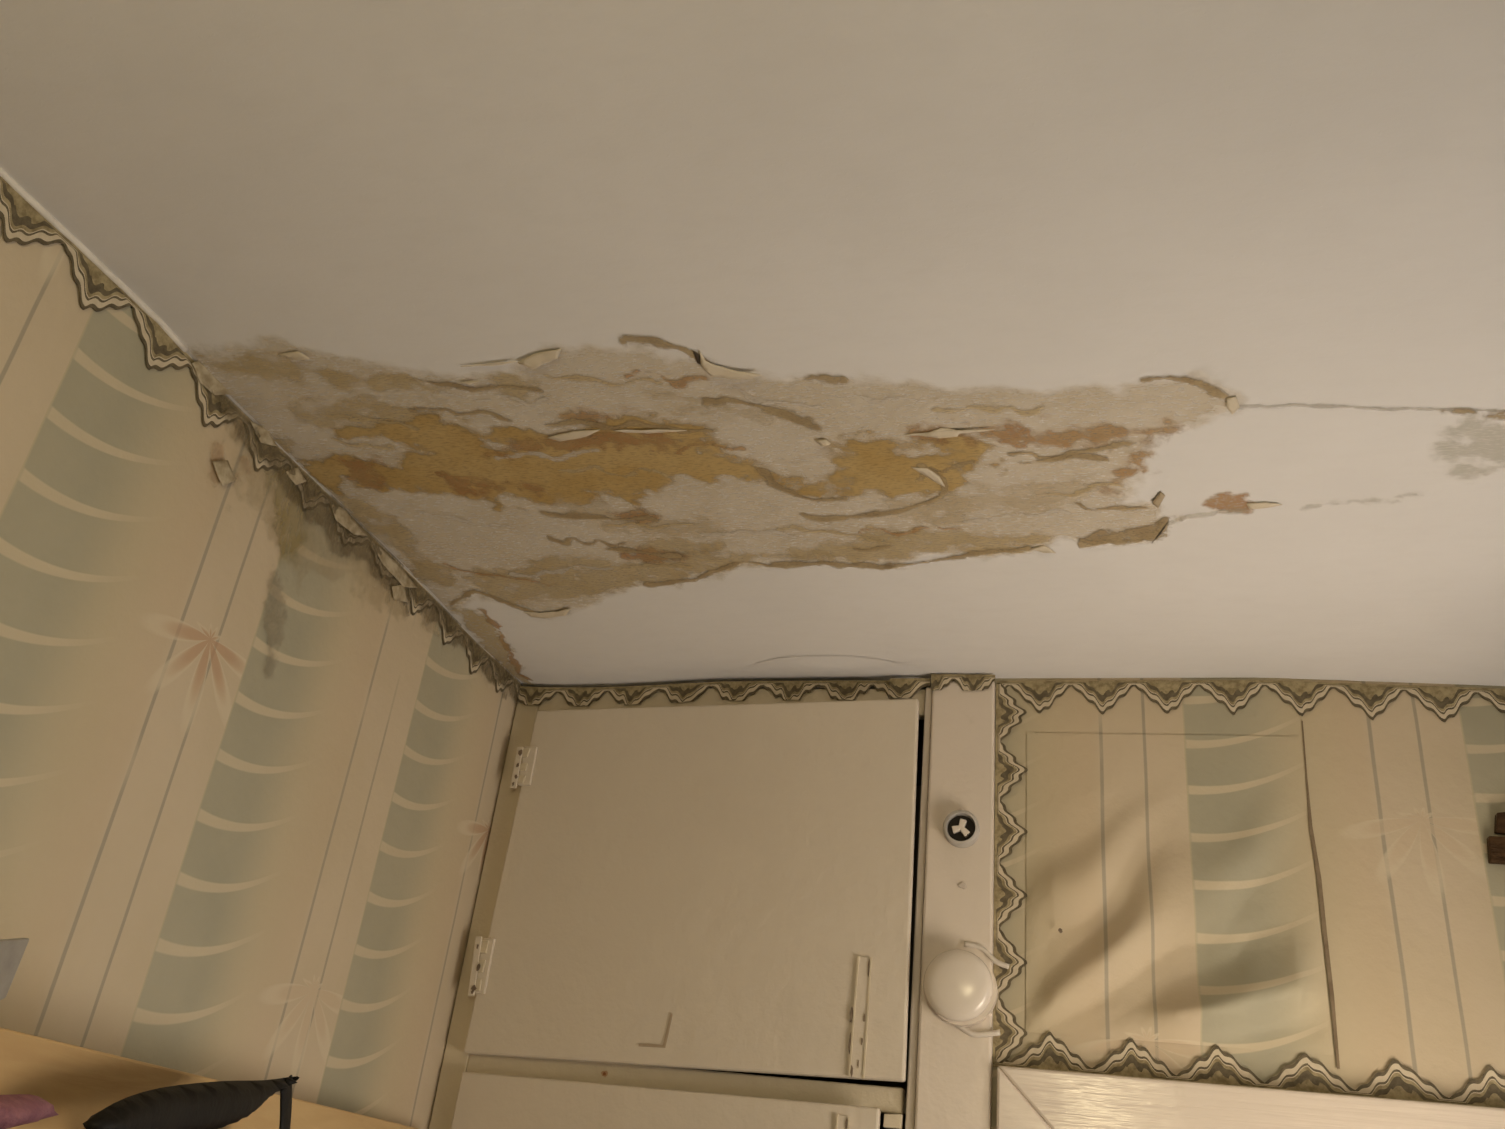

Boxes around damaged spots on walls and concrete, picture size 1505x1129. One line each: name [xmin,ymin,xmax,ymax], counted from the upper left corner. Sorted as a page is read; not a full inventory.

crack [1239,404,1505,420]